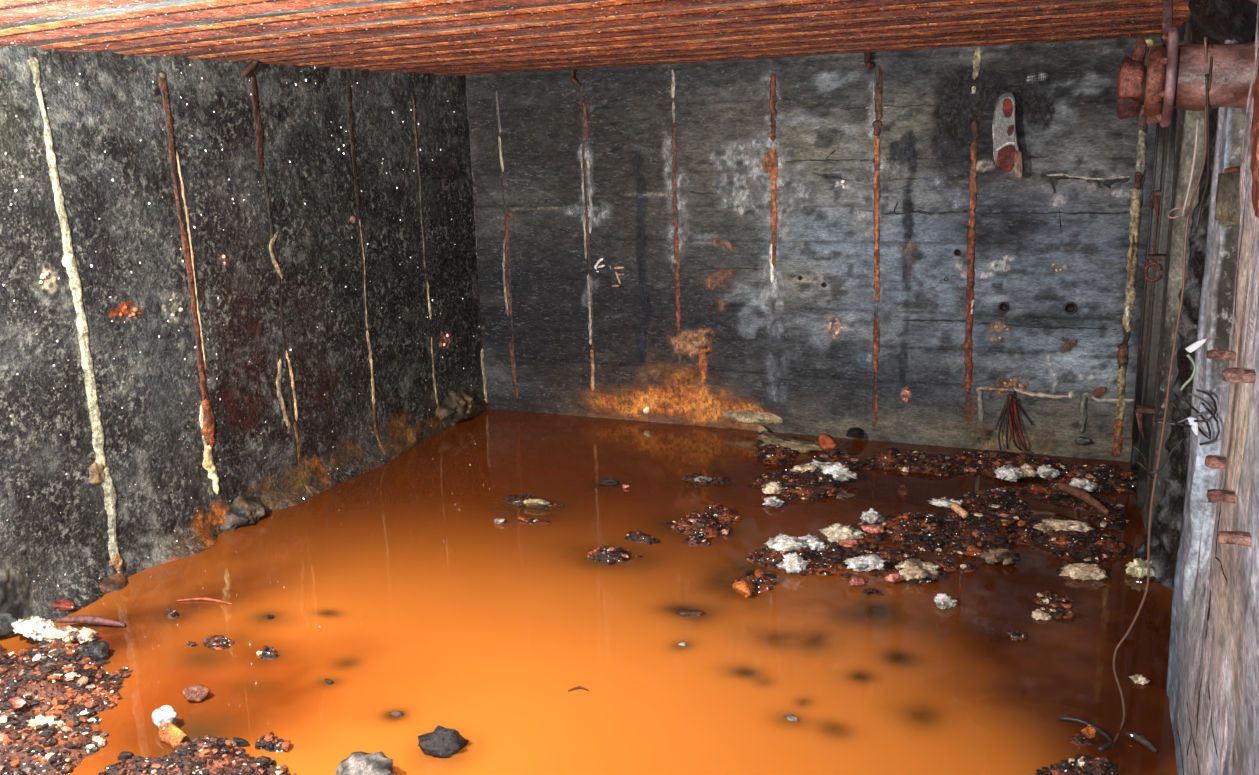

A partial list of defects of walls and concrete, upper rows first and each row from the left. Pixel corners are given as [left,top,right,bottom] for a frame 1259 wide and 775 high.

water stain [512,147,608,223]
rust [595,329,763,426]